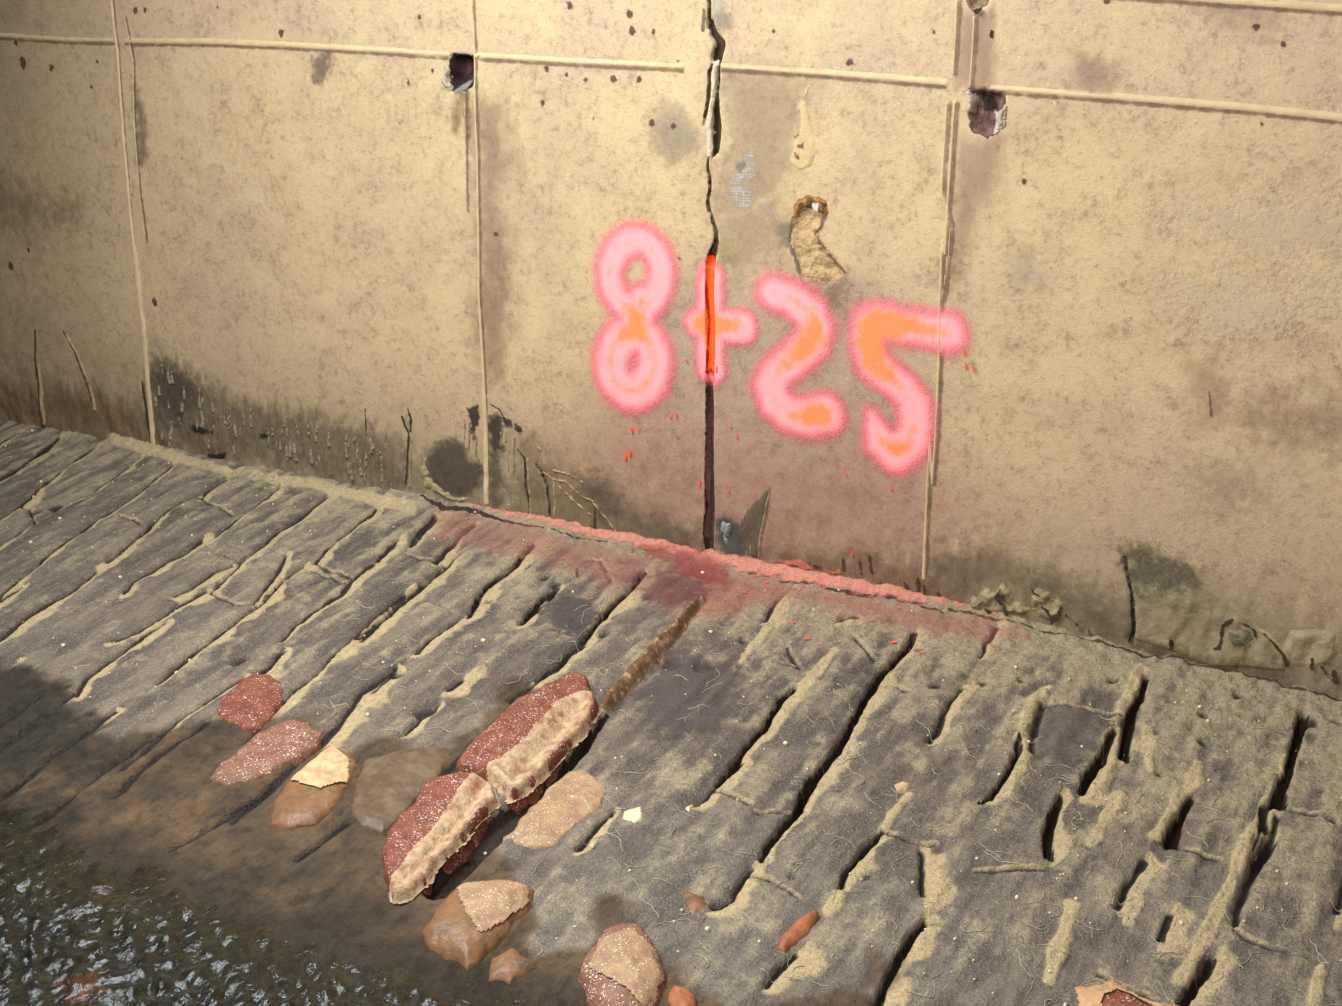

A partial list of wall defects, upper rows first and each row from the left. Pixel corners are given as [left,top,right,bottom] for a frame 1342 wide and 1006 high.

spalling [431,52,474,133]
crack [701,0,726,261]
spalling [960,0,1006,139]
spalling [787,195,845,286]
water stain [420,404,522,506]
crack [401,408,608,619]
crack [703,379,715,550]
crack [426,594,701,901]
crack [718,689,795,788]
crack [748,556,1339,863]
crack [877,924,926,1006]
crack [1180,958,1216,1006]